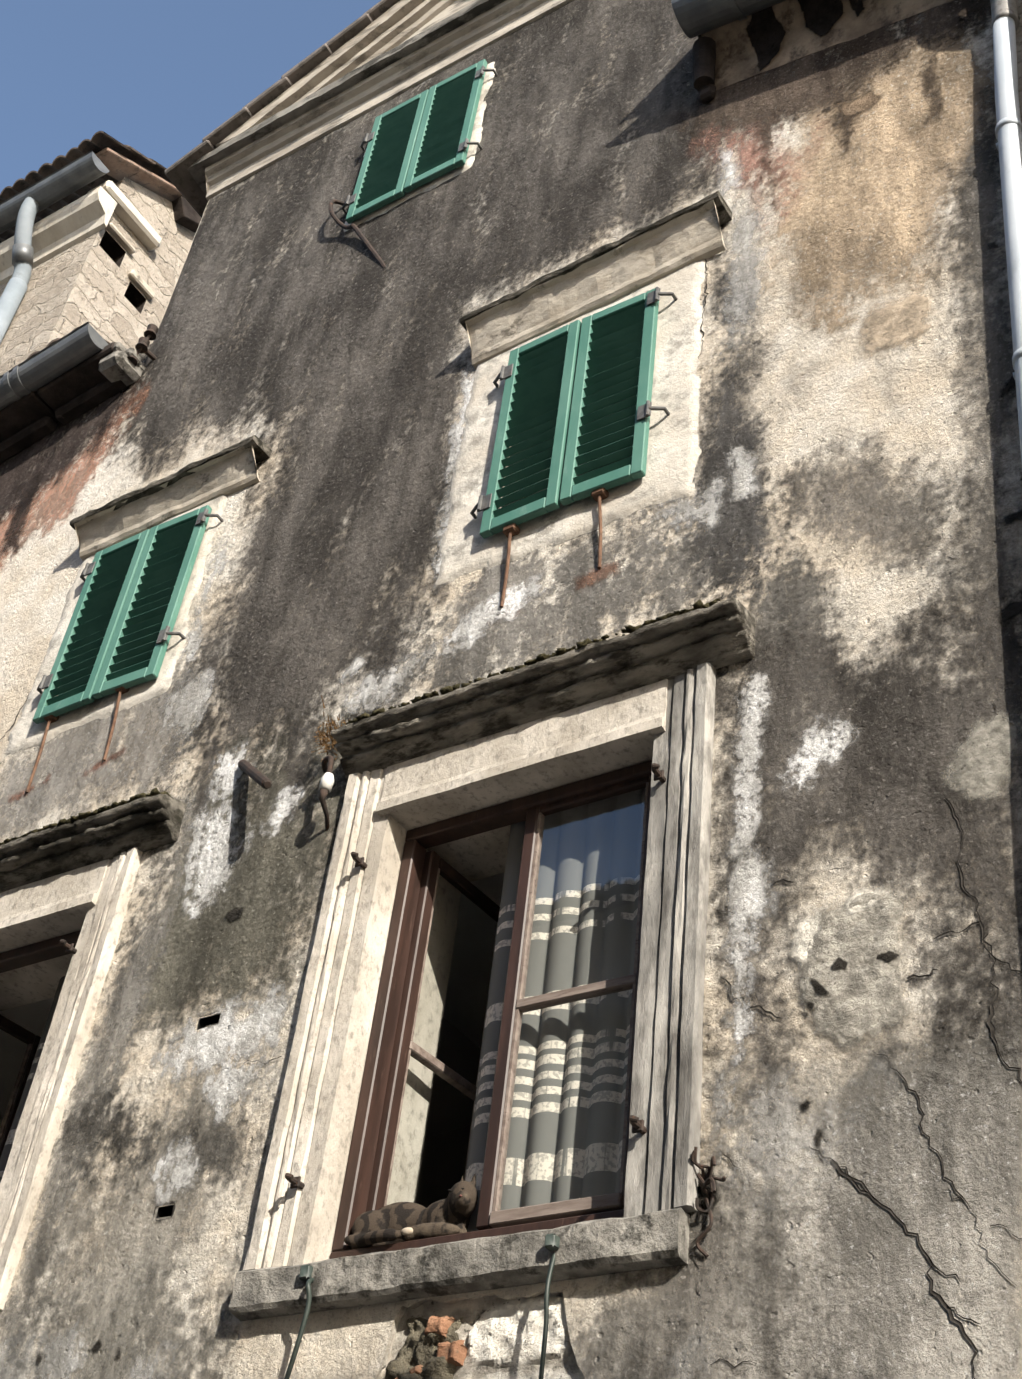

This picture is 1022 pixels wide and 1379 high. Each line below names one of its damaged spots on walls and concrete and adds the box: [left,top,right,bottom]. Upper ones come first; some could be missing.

peeling [746,6,786,71]
peeling [798,0,865,37]
damp [922,57,937,92]
damp [3,476,39,552]
corrosion [0,383,150,567]
damp [775,438,955,572]
damp [423,563,541,649]
spalling [791,888,910,1047]
crack [907,798,1022,1083]
crack [873,1025,1022,1286]
crack [803,1143,979,1379]
spalling [385,1316,468,1379]